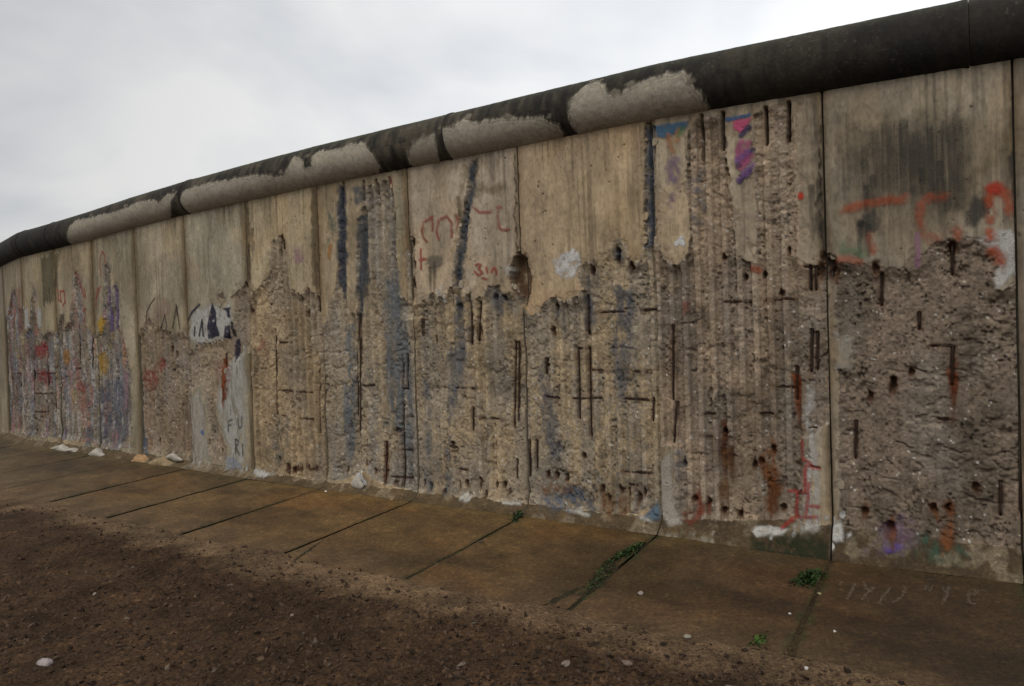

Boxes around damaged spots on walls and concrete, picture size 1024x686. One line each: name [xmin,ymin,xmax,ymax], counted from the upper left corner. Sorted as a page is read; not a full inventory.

spalling [23,70,1022,550]
corrosion [720,419,734,472]
corrosion [762,440,781,513]